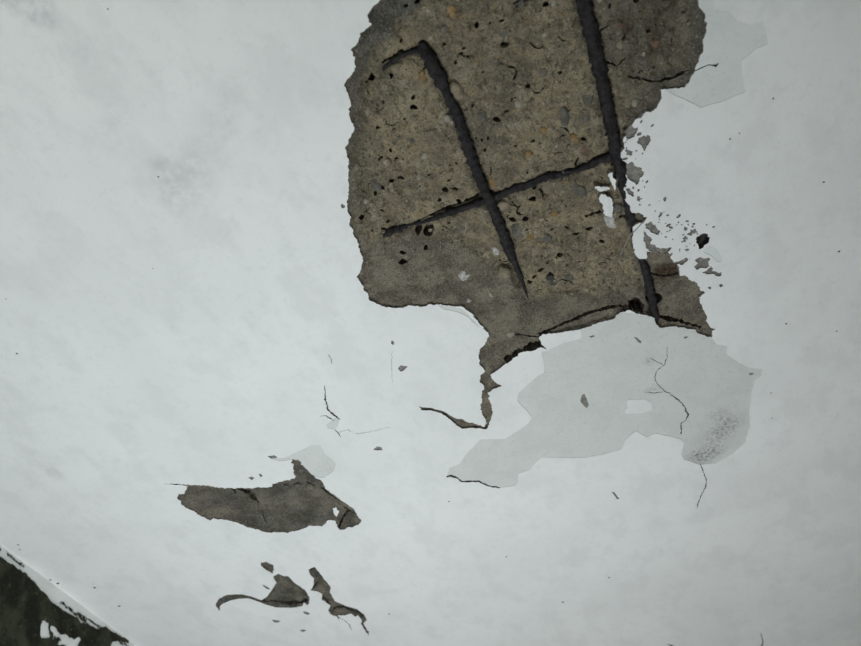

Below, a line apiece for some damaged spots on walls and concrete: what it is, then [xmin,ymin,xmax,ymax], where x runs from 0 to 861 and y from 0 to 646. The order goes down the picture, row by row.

spalling [341,0,768,488]
crack [324,385,389,436]
crack [649,355,689,434]
spalling [177,445,361,533]
spalling [216,562,369,635]